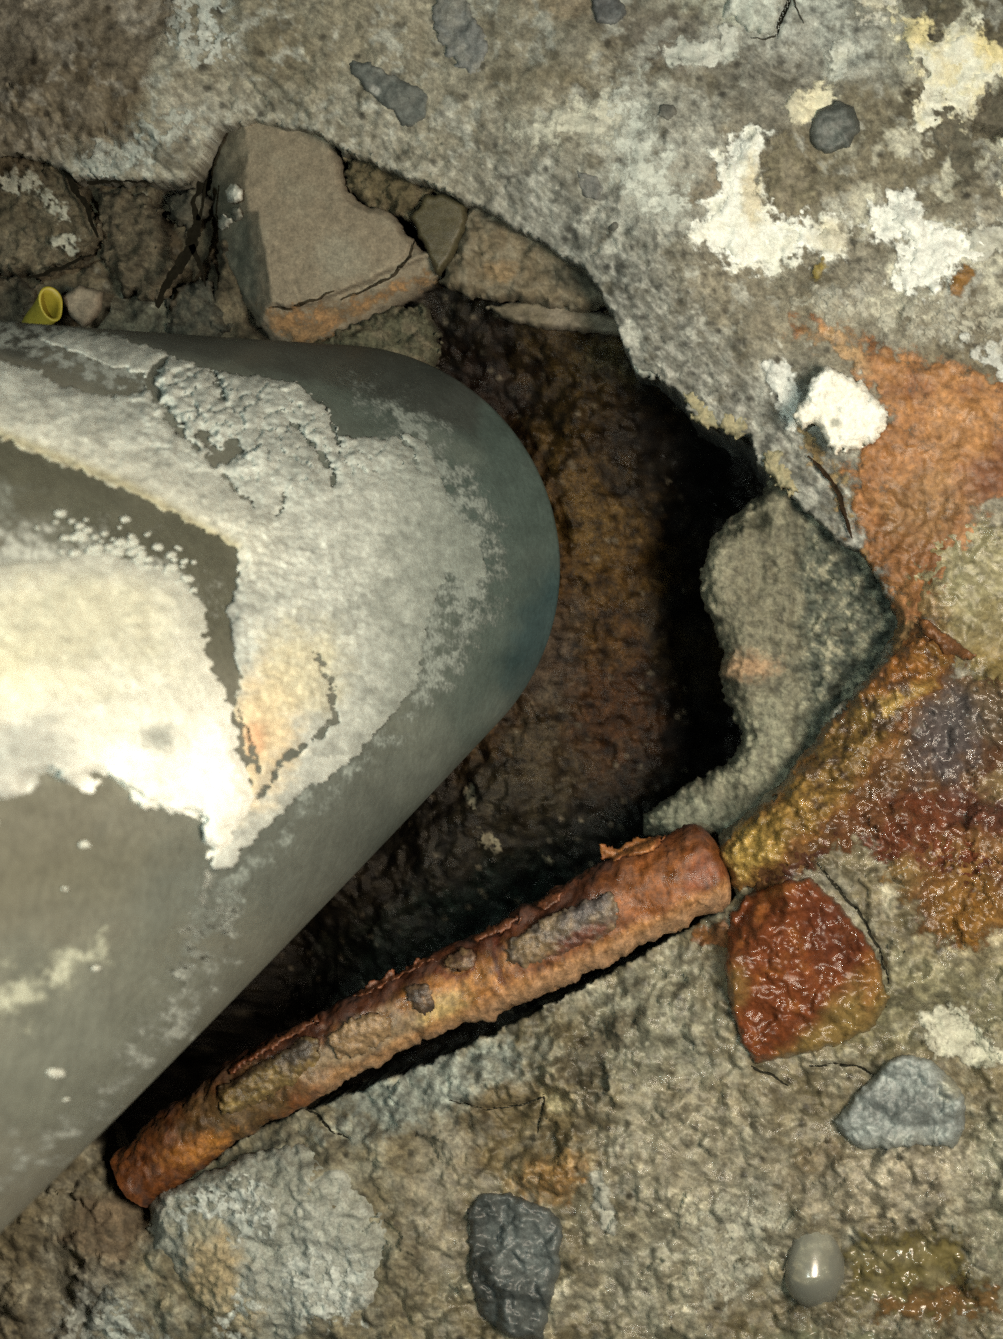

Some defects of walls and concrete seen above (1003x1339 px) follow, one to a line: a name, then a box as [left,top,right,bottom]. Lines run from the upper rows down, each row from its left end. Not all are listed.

water stain [658,23,739,68]
crack [751,0,804,40]
water stain [785,37,855,126]
water stain [855,0,1003,133]
peeling [218,207,243,230]
spalling [409,193,468,276]
water stain [505,64,1003,382]
rust [691,313,1003,1064]
rust [598,835,666,861]
rust [353,954,437,997]
rust [227,1012,392,1075]
spalling [565,1011,635,1074]